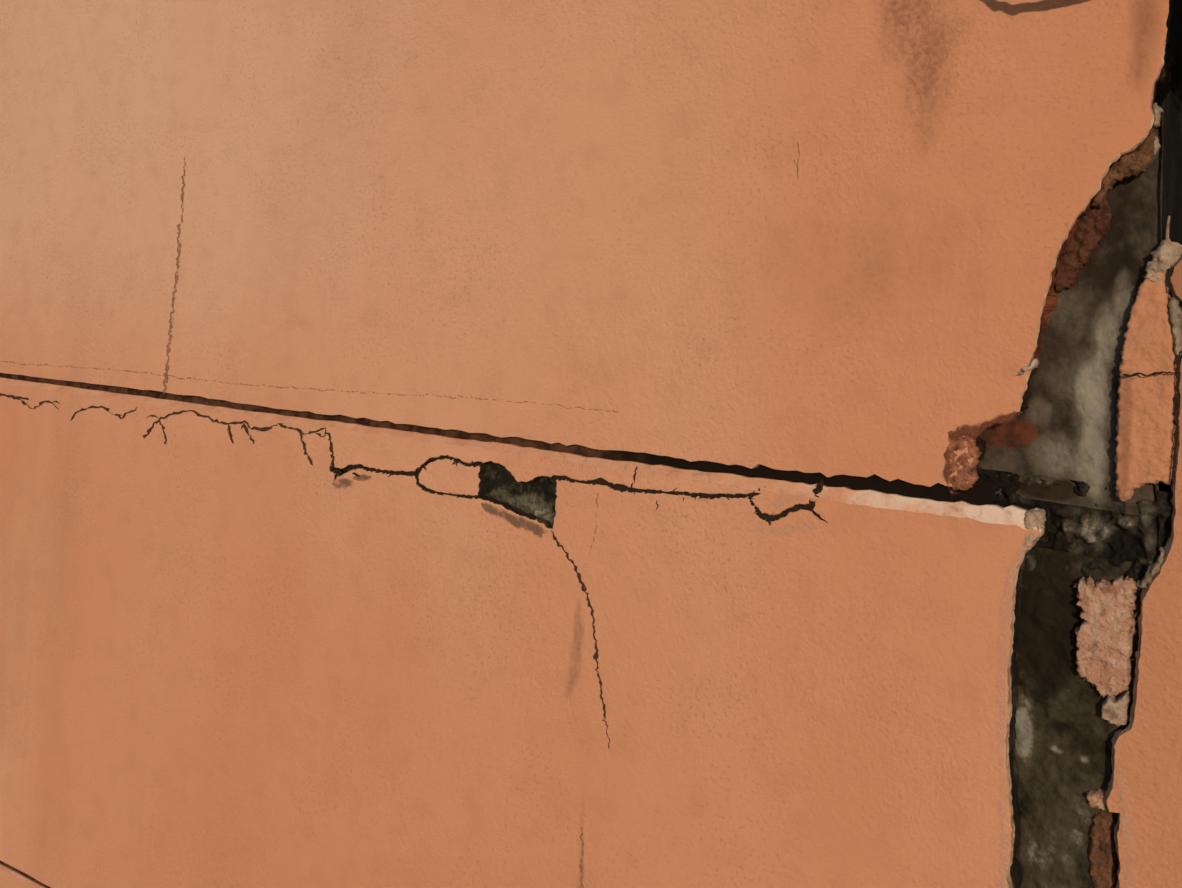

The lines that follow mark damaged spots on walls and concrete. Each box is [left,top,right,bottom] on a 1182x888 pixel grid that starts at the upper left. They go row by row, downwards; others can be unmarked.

crack [0,157,992,749]
spalling [484,462,557,525]
spalling [943,77,1182,727]